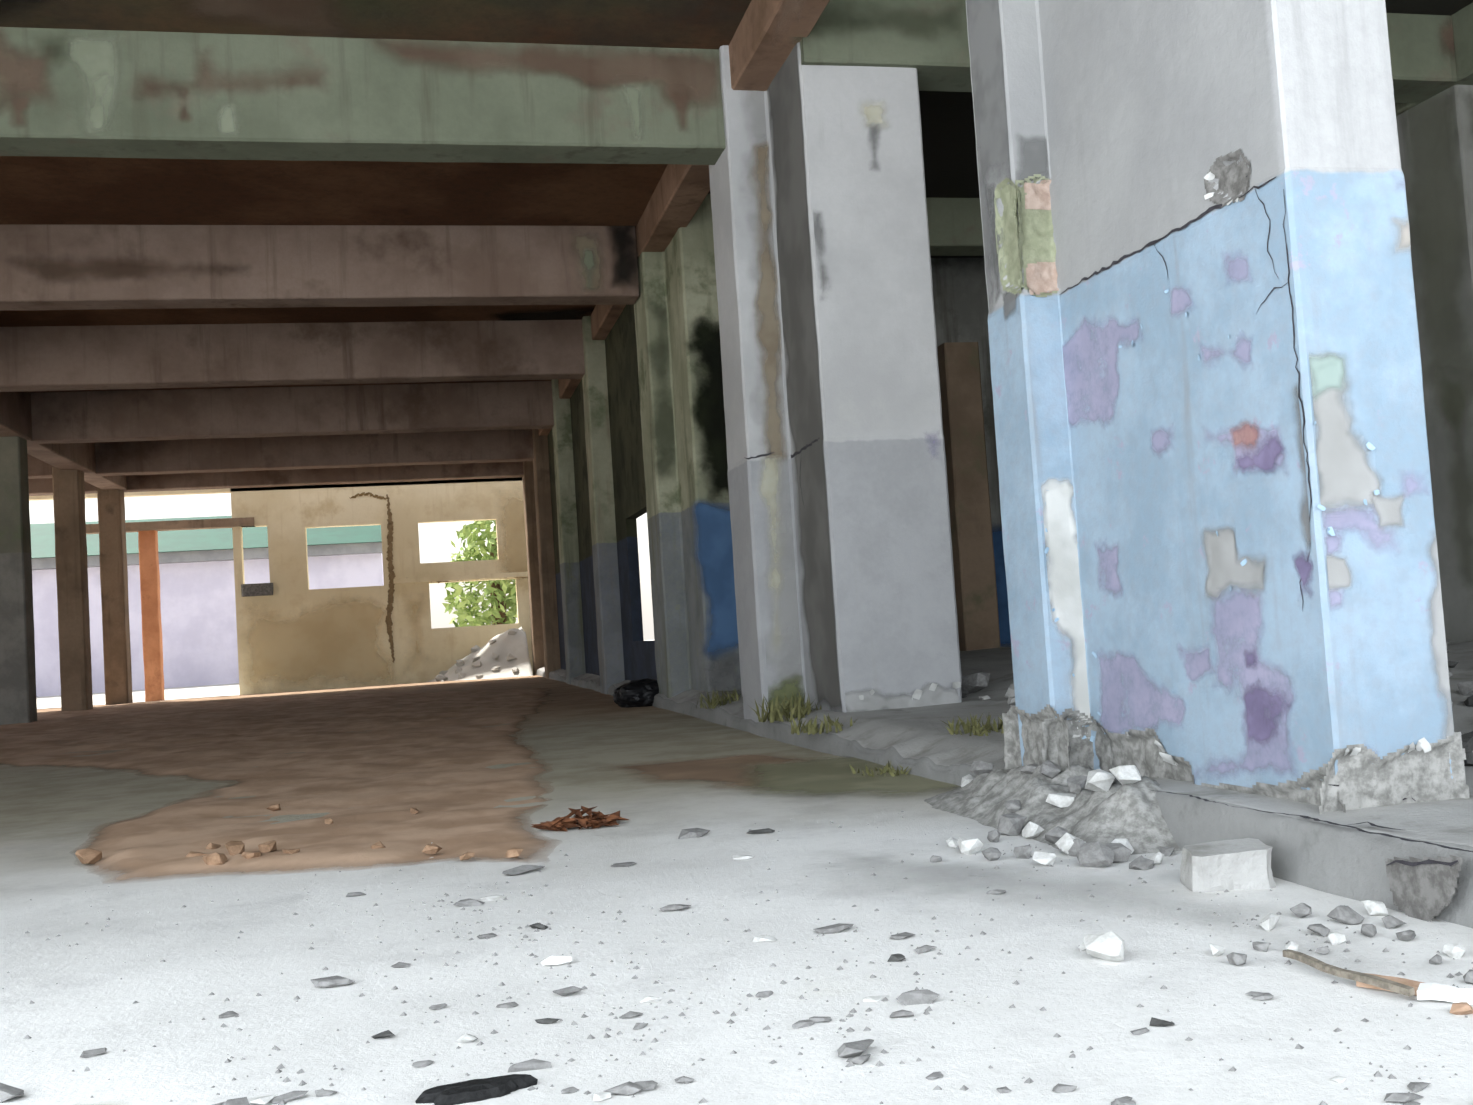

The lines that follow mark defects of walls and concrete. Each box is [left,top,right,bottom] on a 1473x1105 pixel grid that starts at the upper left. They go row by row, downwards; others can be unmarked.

water stain [47,39,116,129]
mould [652,339,675,474]
mould [688,318,729,500]
crack [1059,175,1312,609]
peeling [1309,355,1403,526]
crack [349,492,396,663]
flaking render [1002,479,1470,814]